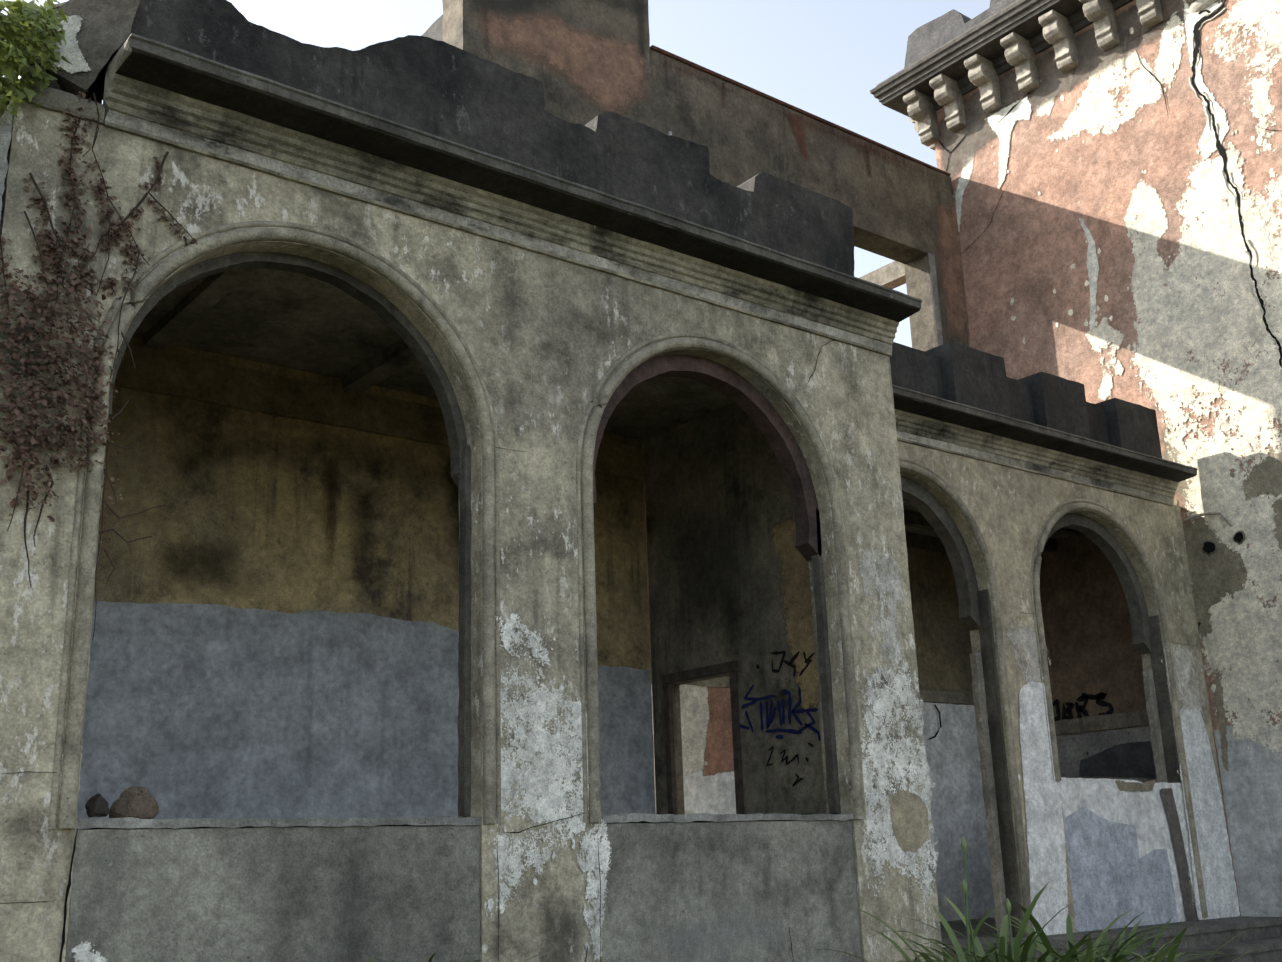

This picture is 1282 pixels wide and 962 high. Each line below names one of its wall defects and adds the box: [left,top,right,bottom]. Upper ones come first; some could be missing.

peeling [940,156,980,335]
crack [1129,0,1282,378]
peeling [988,0,1282,935]
crack [0,829,78,962]
peeling [69,940,107,962]
peeling [487,612,612,960]
peeling [854,538,940,907]